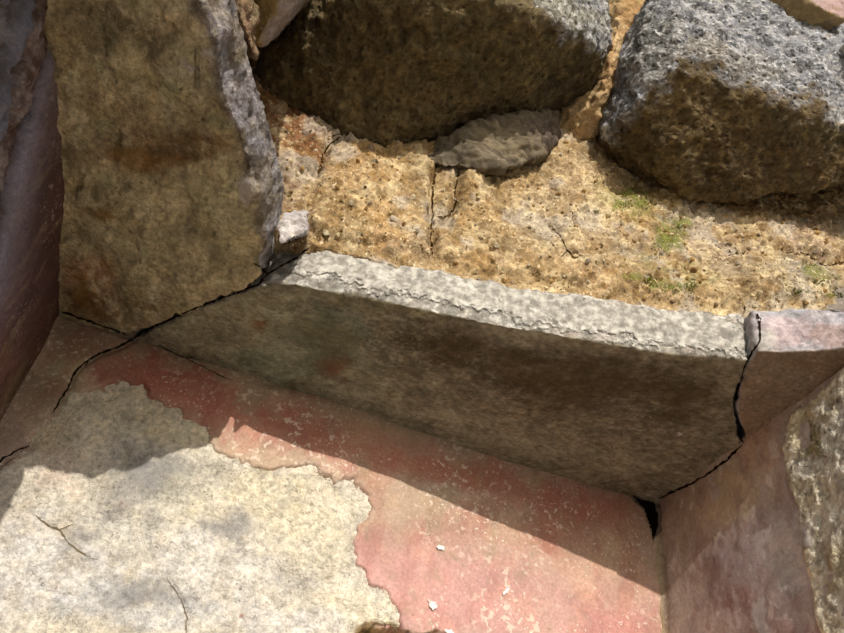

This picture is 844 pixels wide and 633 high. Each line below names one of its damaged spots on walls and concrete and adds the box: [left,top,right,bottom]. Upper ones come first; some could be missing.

crack [430,165,460,255]
crack [0,446,29,463]
crack [53,247,310,412]
peeling [0,380,400,633]
crack [659,306,761,499]